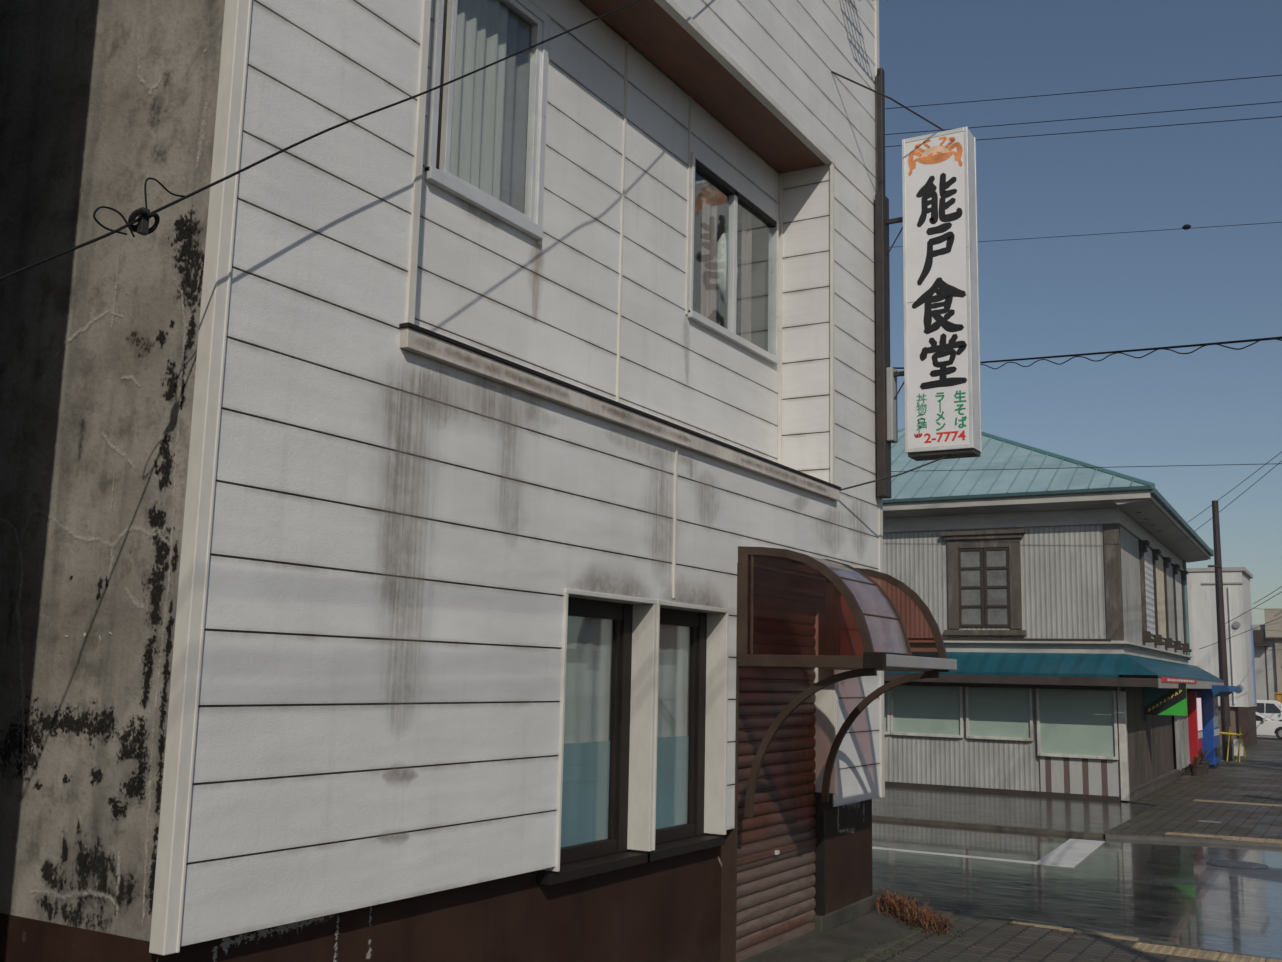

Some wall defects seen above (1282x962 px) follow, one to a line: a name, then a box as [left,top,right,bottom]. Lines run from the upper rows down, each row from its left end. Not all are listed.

crack [0,435,175,917]
water stain [0,690,151,820]
water stain [37,821,138,930]